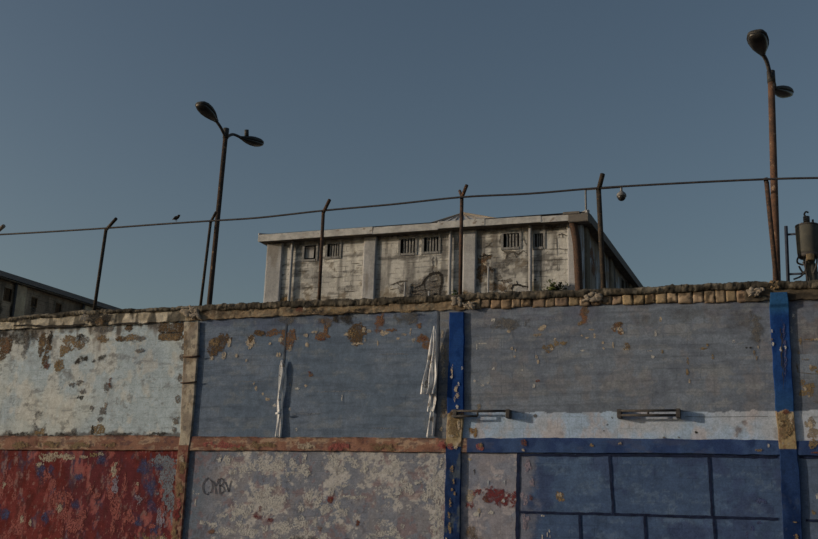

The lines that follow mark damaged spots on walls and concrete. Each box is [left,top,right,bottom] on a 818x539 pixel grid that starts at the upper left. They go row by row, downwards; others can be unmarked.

peeling [0,333,13,360]
peeling [36,312,145,372]
peeling [207,333,247,362]
peeling [245,325,331,357]
peeling [344,322,430,350]
peeling [89,403,107,435]
peeling [326,330,463,539]
peeling [777,409,794,445]
peeling [804,416,818,454]
peeling [37,452,104,539]
peeling [89,454,186,539]
peeling [197,440,367,539]